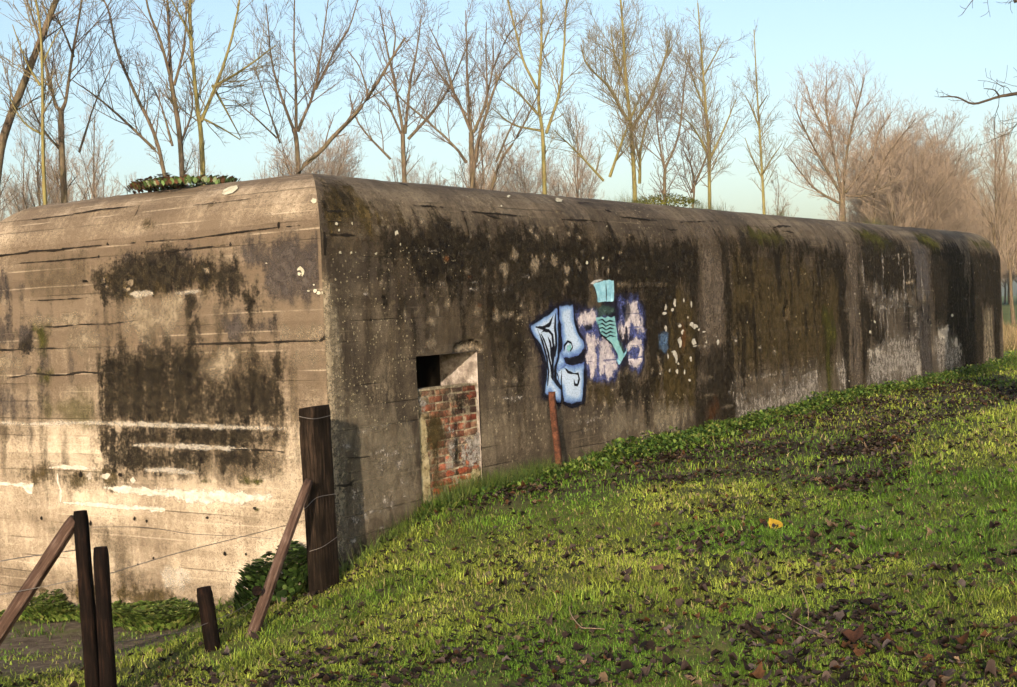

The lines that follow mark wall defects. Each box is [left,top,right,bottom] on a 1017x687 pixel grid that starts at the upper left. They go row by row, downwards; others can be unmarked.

damp [0,246,295,512]
damp [322,183,1001,427]